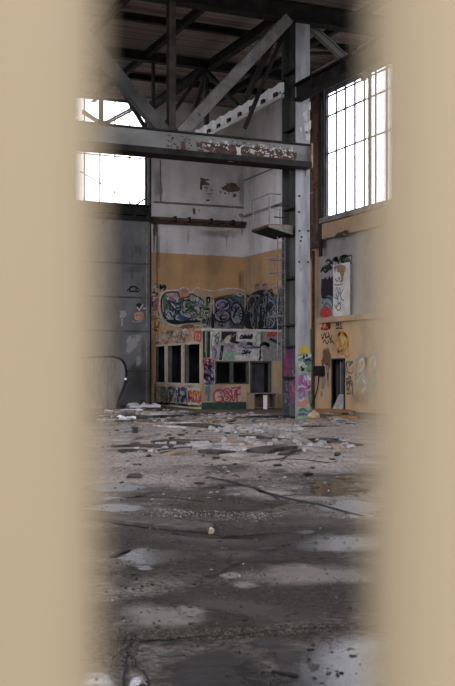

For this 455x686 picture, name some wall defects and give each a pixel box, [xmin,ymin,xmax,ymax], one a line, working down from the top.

peeling [200,177,240,201]